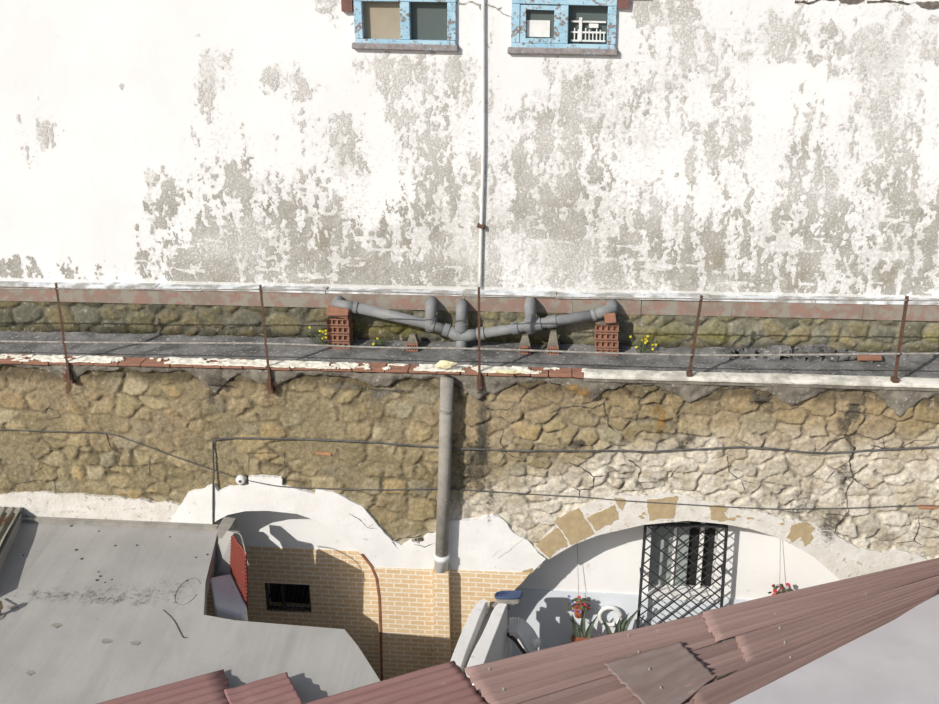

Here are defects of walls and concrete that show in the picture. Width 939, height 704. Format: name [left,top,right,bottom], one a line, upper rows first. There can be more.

peeling [36,119,64,148]
peeling [135,0,939,295]
peeling [0,255,43,278]
peeling [57,258,104,279]
crack [551,397,621,435]
leakage [459,397,493,505]
crack [560,460,680,499]
crack [819,422,934,533]
crack [897,511,937,545]